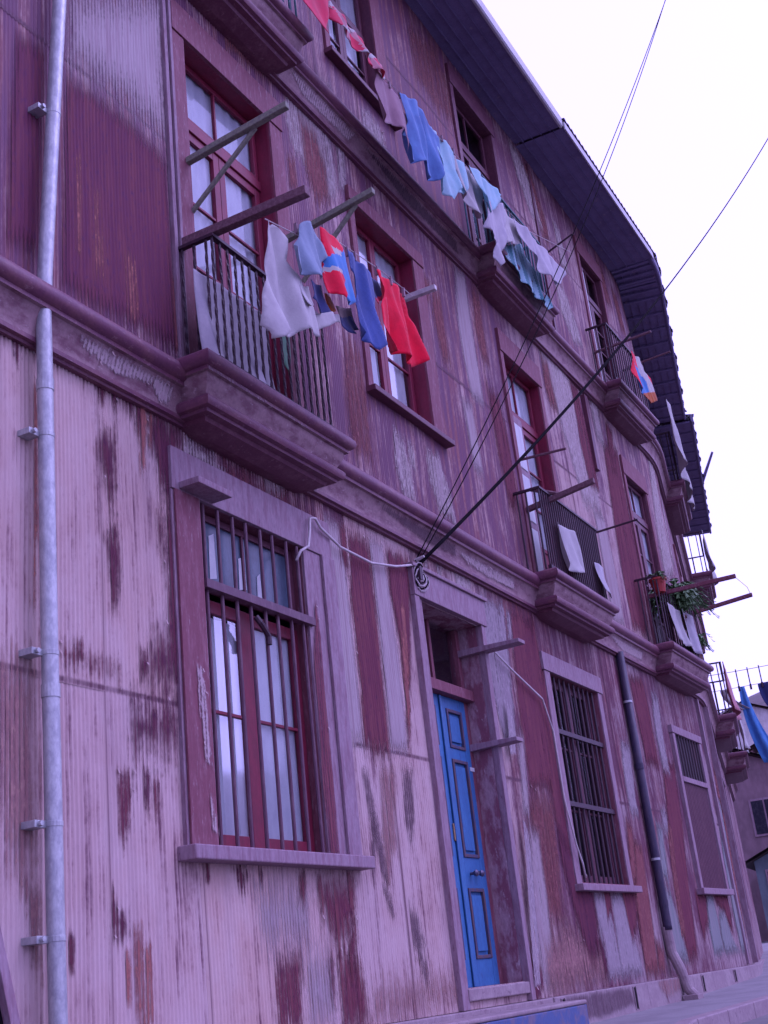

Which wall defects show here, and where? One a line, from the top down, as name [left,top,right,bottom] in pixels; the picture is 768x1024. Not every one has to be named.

rust [337,522,396,883]
rust [509,608,680,997]
rust [628,673,746,965]
rust [126,921,154,1024]
rust [274,946,304,1024]